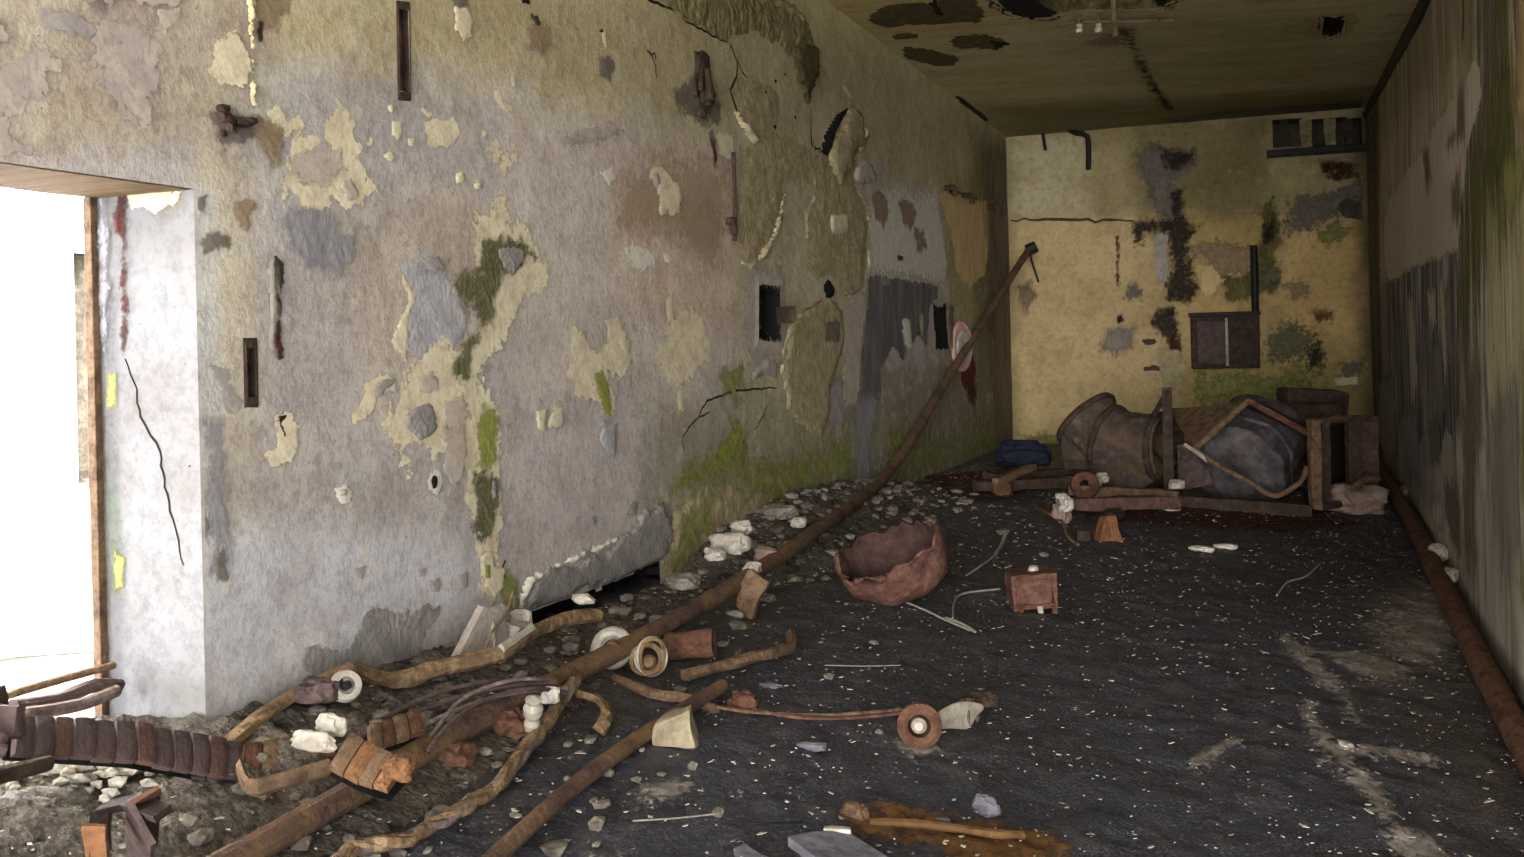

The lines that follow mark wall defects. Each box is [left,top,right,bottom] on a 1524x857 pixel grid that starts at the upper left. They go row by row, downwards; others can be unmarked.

rust [113,195,129,351]
peeling [127,191,181,214]
crack [125,359,184,565]
peeling [267,97,462,276]
peeling [302,128,774,676]
crack [682,387,777,450]
flaking render [739,84,954,437]
spalling [868,0,1184,66]
leakage [1118,27,1520,619]
leakage [1483,0,1524,231]
leakage [1189,737,1248,769]
leakage [1279,574,1460,857]